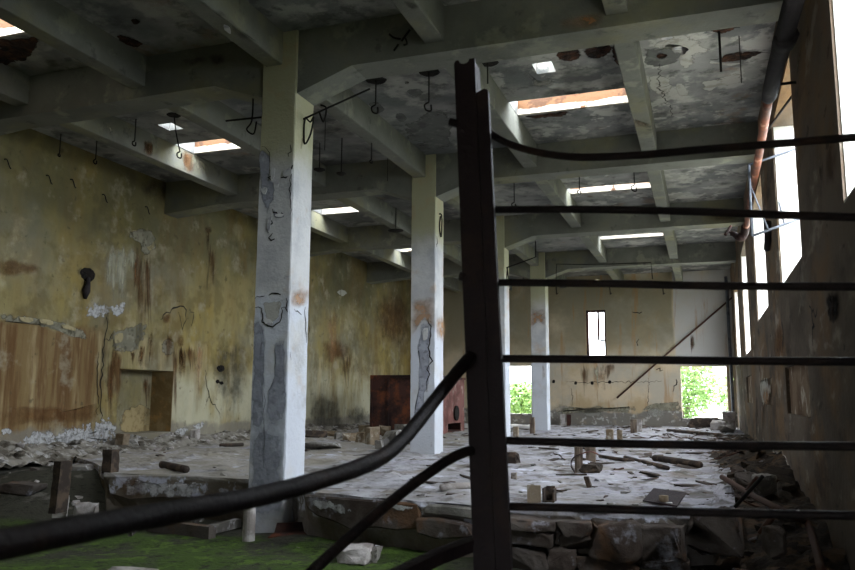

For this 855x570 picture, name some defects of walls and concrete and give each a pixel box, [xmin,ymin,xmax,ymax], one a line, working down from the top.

spalling [0,37,39,65]
spalling [556,45,619,65]
crack [657,64,673,116]
peeling [644,35,768,97]
flaking render [259,145,293,241]
rust [135,255,150,309]
peeling [1,315,86,339]
damp [87,302,125,318]
crack [96,317,113,421]
rust [108,348,121,400]
flaking render [252,302,286,487]
flaking render [414,322,433,415]